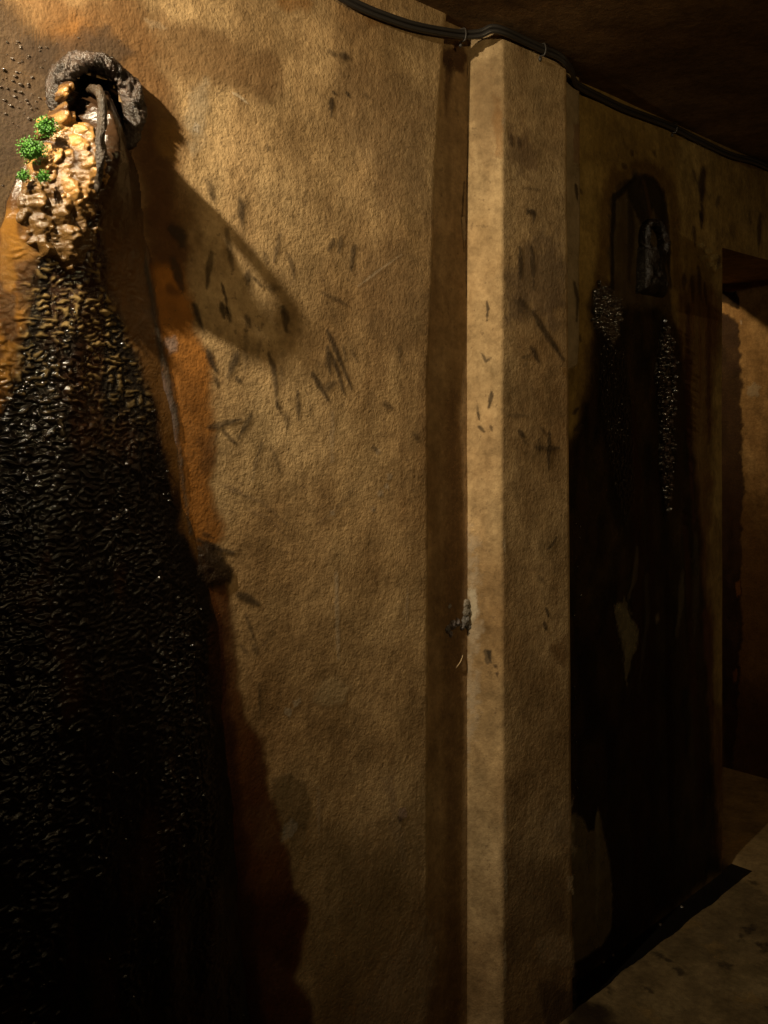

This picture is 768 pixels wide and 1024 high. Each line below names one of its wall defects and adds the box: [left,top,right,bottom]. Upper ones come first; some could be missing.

corrosion [27,0,221,546]
water stain [206,349,240,382]
water stain [542,286,759,1024]